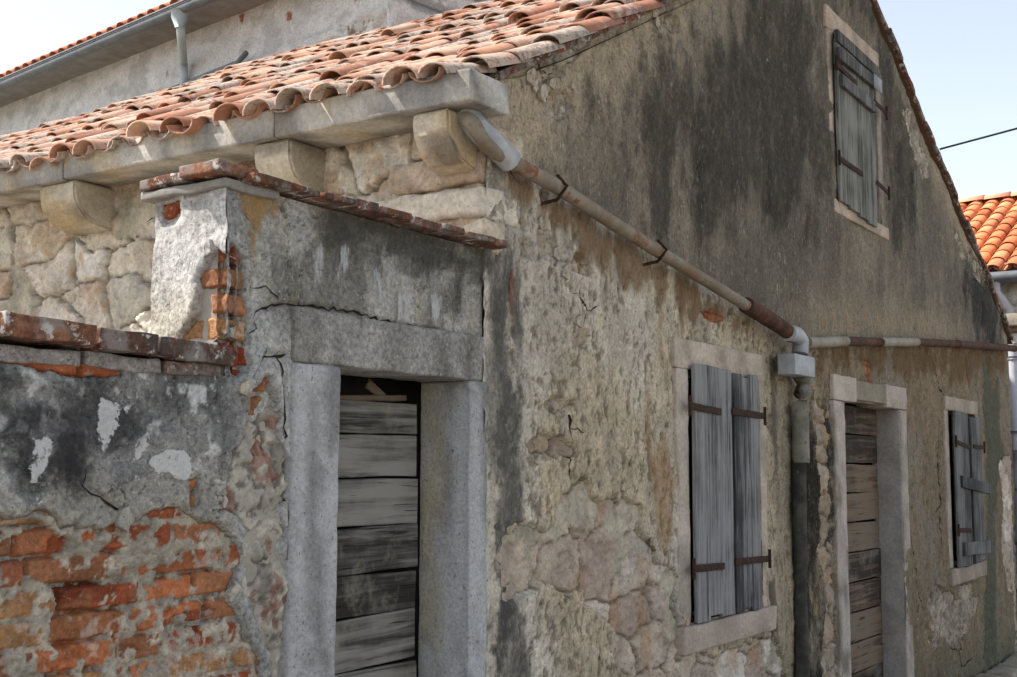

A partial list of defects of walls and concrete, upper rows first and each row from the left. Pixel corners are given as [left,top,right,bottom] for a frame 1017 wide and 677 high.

corrosion [509,170,533,216]
corrosion [540,202,722,326]
leakage [636,0,831,247]
peeling [0,236,288,677]
leakage [482,247,524,548]
leakage [498,583,531,677]